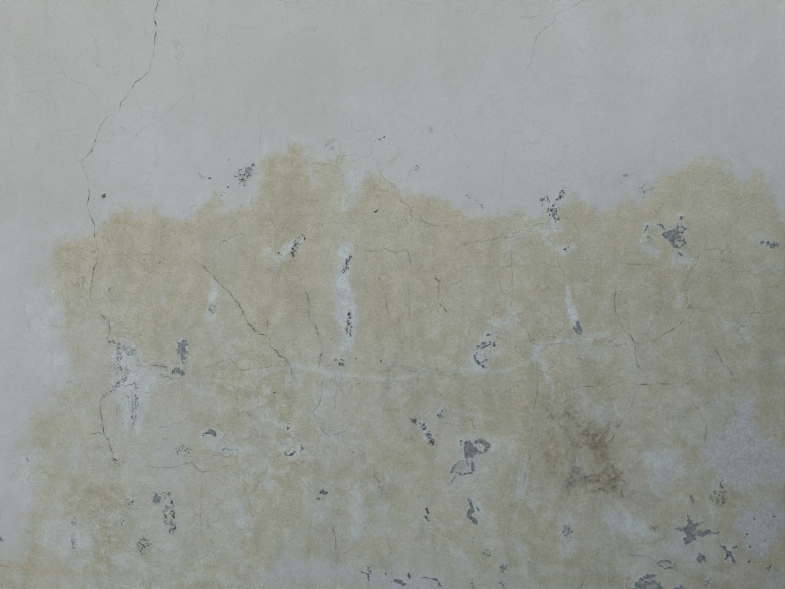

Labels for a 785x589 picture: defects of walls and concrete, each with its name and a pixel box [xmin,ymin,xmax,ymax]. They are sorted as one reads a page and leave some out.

crack [76,0,160,298]
peeling [220,161,256,197]
spalling [652,209,691,261]
crack [101,315,112,344]
peeling [100,336,191,432]
crack [193,259,293,415]
damp [0,126,785,589]
peeling [409,416,437,446]
spalling [151,490,177,535]
spalling [444,433,496,529]
spalling [672,493,751,565]
spalling [623,557,685,589]